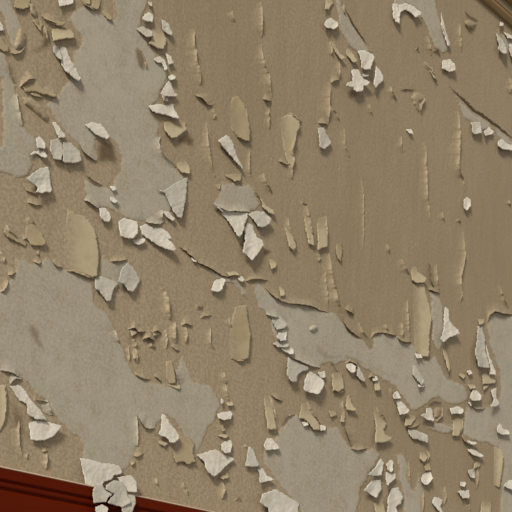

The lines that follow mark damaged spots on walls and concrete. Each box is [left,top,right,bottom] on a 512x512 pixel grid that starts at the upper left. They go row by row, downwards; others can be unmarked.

peeling [0,0,190,251]
peeling [185,28,201,86]
peeling [195,93,275,260]
peeling [392,0,456,72]
crack [449,86,512,138]
peeling [0,209,234,512]
peeling [206,201,512,512]